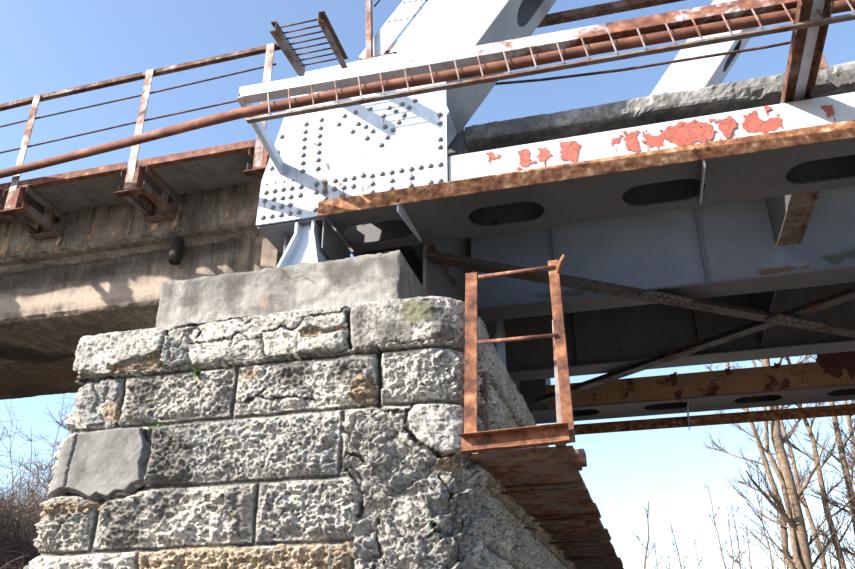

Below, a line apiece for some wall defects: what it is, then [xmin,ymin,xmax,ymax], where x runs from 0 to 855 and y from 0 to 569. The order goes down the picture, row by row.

peeling [611,105,784,152]
peeling [821,105,835,120]
peeling [516,140,581,170]
crack [160,307,351,356]
peeling [73,350,163,428]
crack [238,388,316,404]
spalling [348,374,379,407]
crack [376,348,441,458]
crack [343,427,387,569]
crack [427,479,464,561]